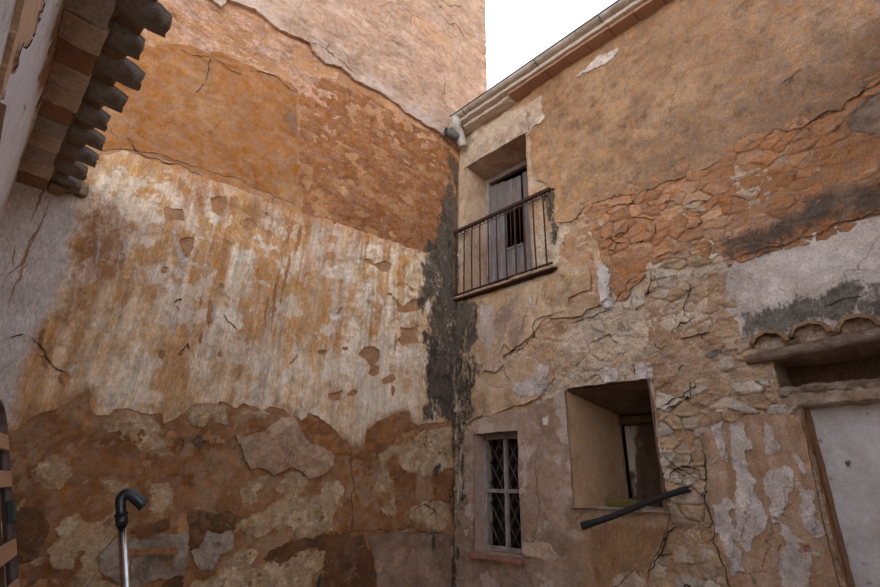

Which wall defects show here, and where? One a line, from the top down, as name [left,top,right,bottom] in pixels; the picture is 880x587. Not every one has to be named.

spalling [157,0,459,250]
flaking render [466,96,545,165]
flaking render [576,48,619,77]
crack [10,334,69,376]
damp [418,157,523,524]
crack [499,200,710,355]
crack [664,365,696,408]
spalling [559,72,880,587]
damp [705,279,880,358]
crack [735,213,880,259]
spalling [8,389,456,587]
crack [664,435,730,587]